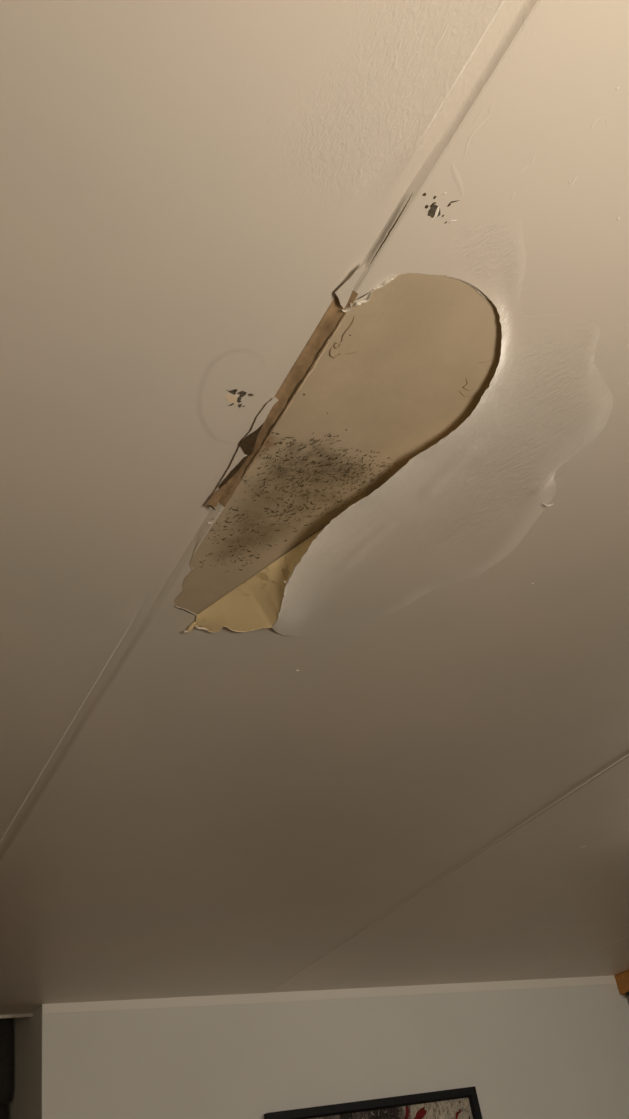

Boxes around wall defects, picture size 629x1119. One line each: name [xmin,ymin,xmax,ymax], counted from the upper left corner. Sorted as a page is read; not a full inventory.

damp [200,432,395,573]
peeling [174,207,613,636]